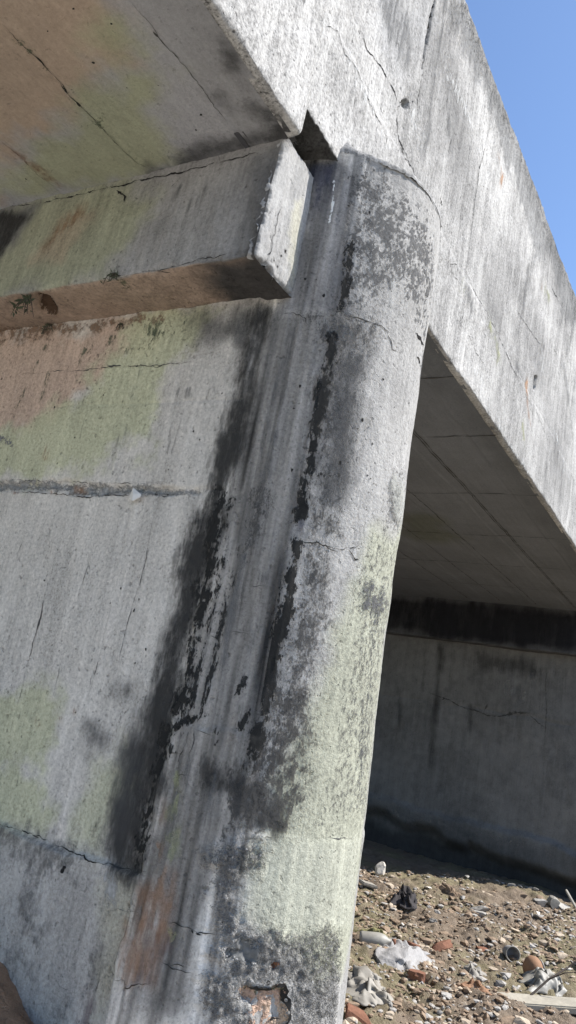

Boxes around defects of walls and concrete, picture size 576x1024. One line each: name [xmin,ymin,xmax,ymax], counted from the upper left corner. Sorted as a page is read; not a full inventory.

crack [3,30,274,206]
crack [134,6,228,124]
crack [317,9,423,174]
crack [17,361,190,437]
crack [6,480,201,498]
damp [104,307,272,899]
damp [202,240,375,842]
crack [304,541,362,562]
damp [318,470,576,833]
crack [0,824,118,868]
peeling [196,835,342,1024]